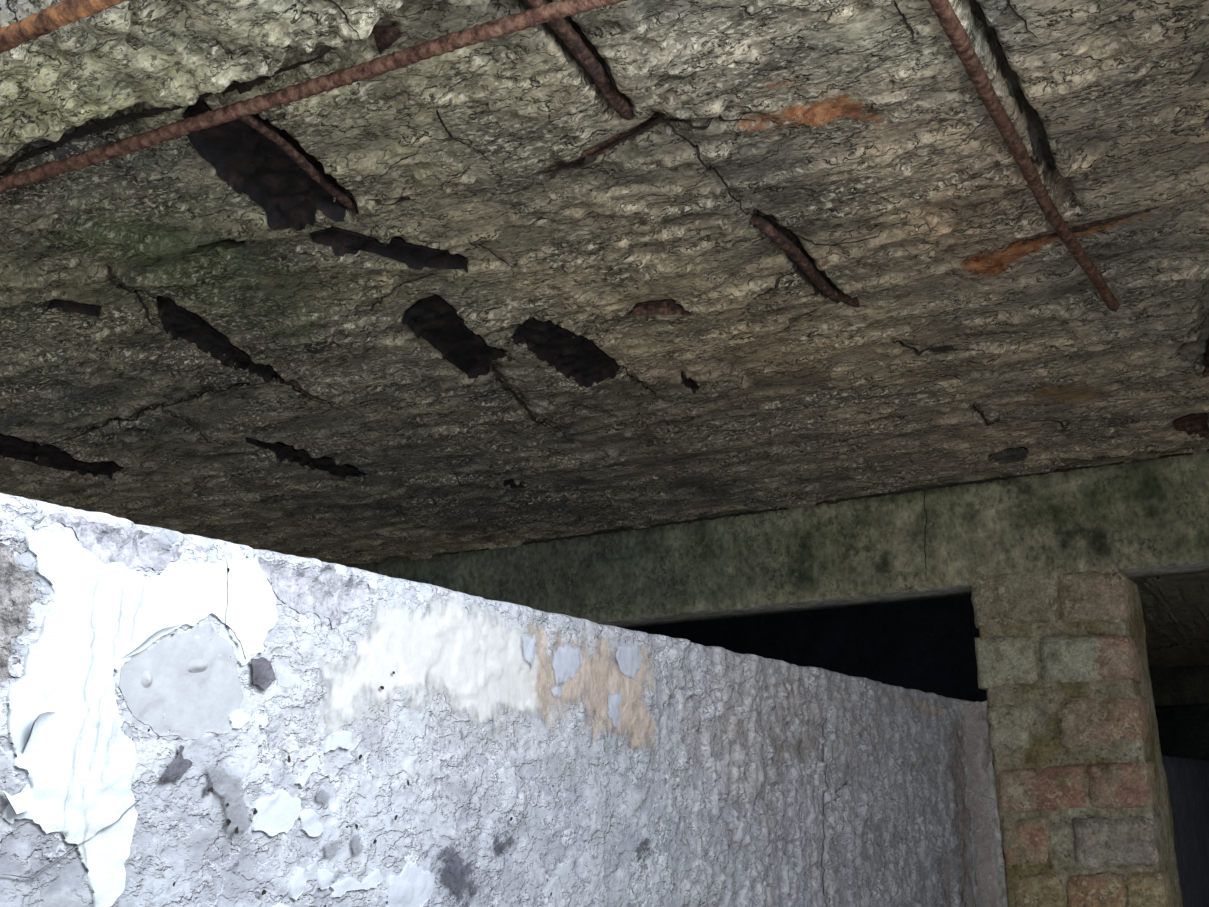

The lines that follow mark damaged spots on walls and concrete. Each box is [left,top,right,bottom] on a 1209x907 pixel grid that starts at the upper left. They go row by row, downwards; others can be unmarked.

corrosion [371,25,402,55]
corrosion [740,95,883,131]
spalling [0,0,665,273]
spalling [749,210,860,308]
corrosion [961,215,1149,278]
spalling [402,294,621,388]
spalling [0,434,123,480]
spalling [246,438,366,478]
peeling [616,644,643,678]
peeling [0,513,583,907]
peeling [607,691,621,728]